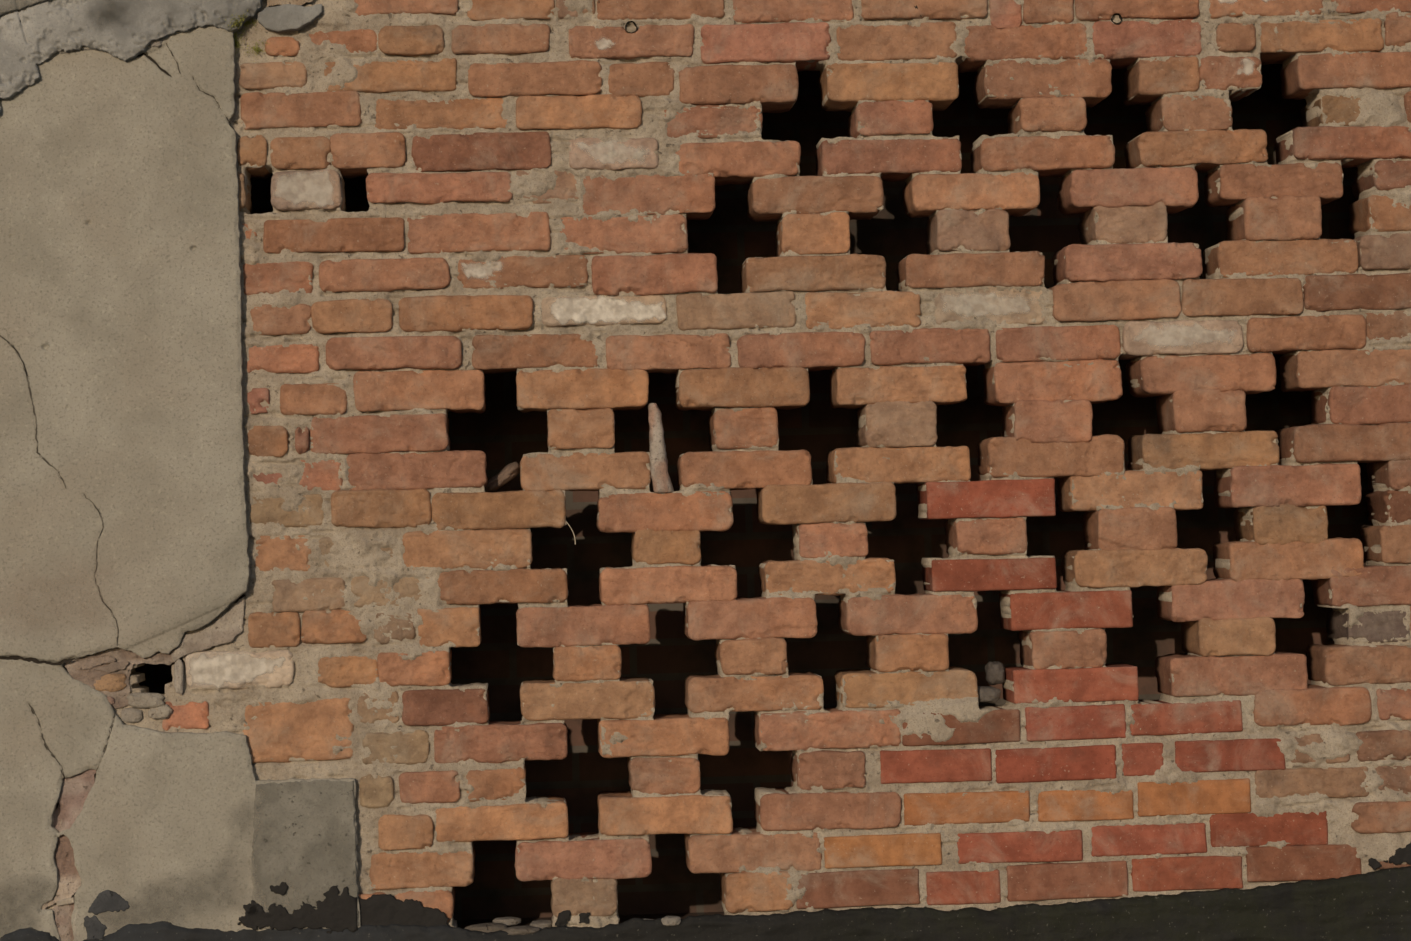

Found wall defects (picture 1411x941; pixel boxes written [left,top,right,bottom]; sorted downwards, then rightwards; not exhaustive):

peeling [257,0,323,33]
crack [135,47,231,124]
crack [0,330,119,641]
crack [0,656,75,665]
flaking render [63,596,246,723]
crack [29,704,115,781]
flaking render [41,769,129,941]